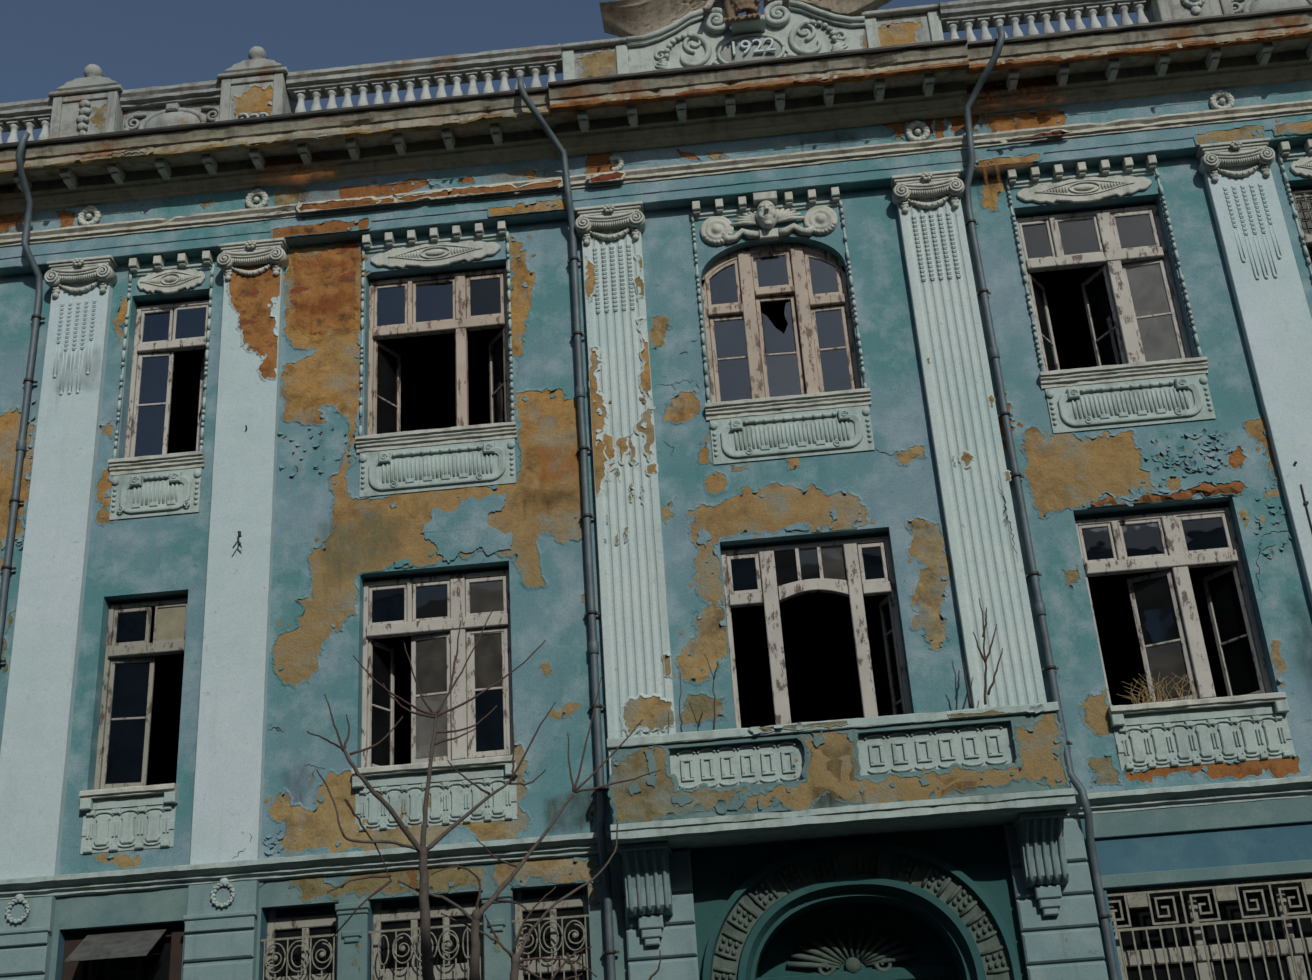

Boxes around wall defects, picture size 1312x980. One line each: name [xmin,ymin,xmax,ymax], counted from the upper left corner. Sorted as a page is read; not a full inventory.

peeling [576,47,632,78]
peeling [860,19,924,49]
peeling [580,152,626,183]
peeling [922,106,1072,213]
peeling [1194,117,1312,145]
peeling [0,405,37,587]
peeling [223,167,703,691]
peeling [988,382,1282,531]
peeling [589,428,1070,832]
peeling [1076,685,1303,790]
peeling [264,738,533,856]
peeling [287,856,602,906]